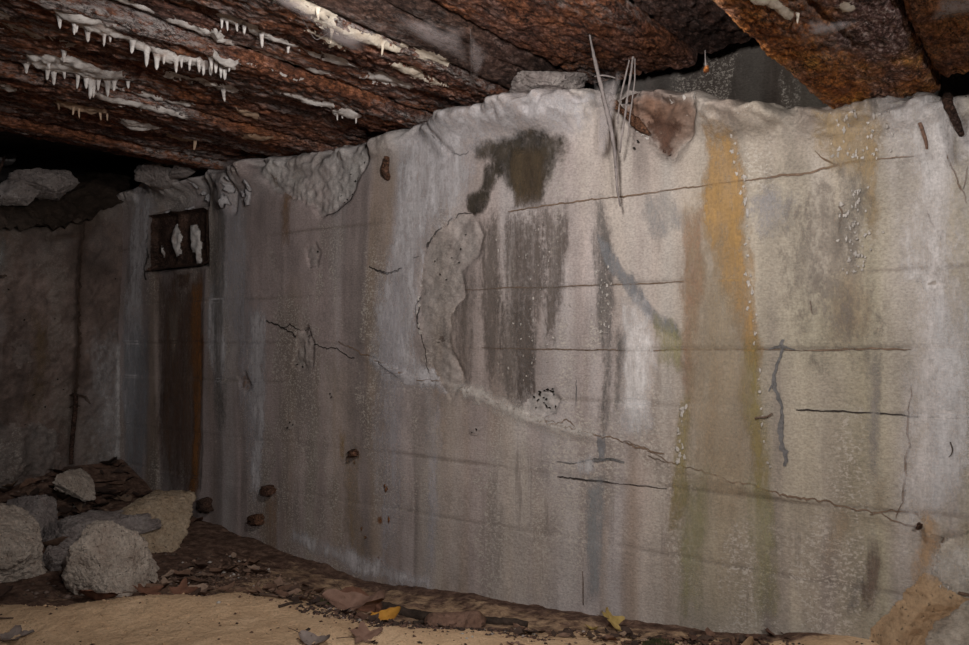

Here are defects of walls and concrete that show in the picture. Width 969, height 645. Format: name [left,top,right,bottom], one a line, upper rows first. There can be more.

rust [158,269,204,492]
water stain [0,0,450,150]
spalling [244,137,373,217]
crack [369,211,477,274]
spalling [416,214,484,398]
water stain [375,93,606,477]
crack [259,290,969,574]
water stain [593,205,681,430]
spalling [623,92,696,161]
rust [673,134,766,515]
crack [508,151,968,212]
water stain [891,93,968,518]